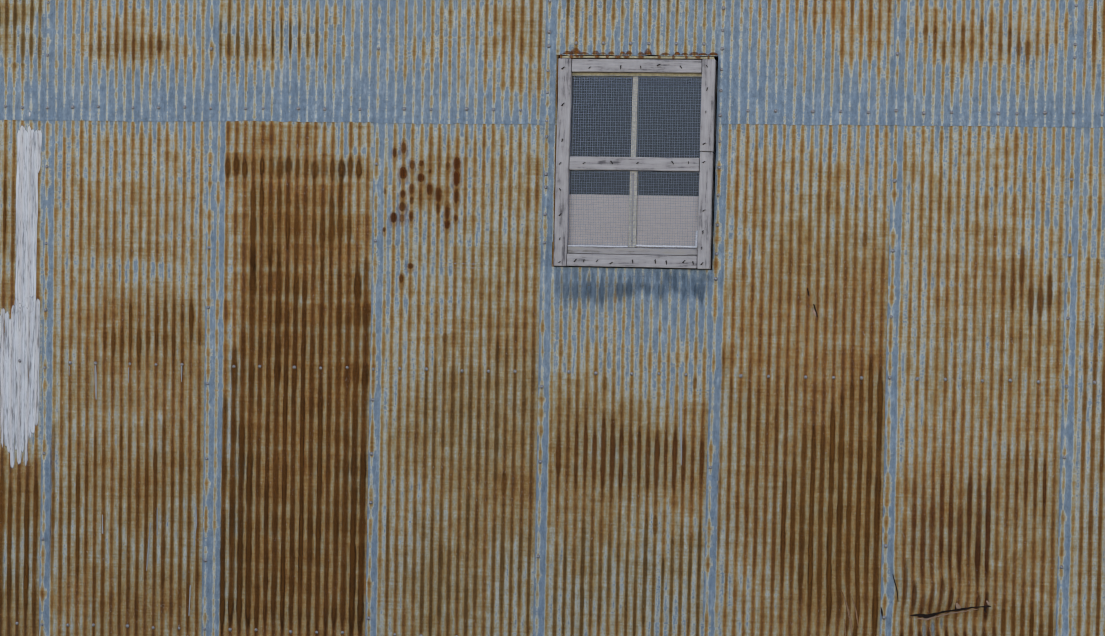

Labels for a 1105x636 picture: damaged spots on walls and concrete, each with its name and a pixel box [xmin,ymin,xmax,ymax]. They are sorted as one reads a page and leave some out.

corrosion [560,48,718,59]
corrosion [383,143,460,232]
corrosion [129,305,141,359]
corrosion [220,158,368,636]
corrosion [76,463,87,576]
corrosion [145,452,165,530]
corrosion [574,419,623,489]
corrosion [637,432,685,486]
corrosion [780,367,883,636]
corrosion [940,482,991,575]
corrosion [1035,461,1046,506]
crack [881,575,991,620]